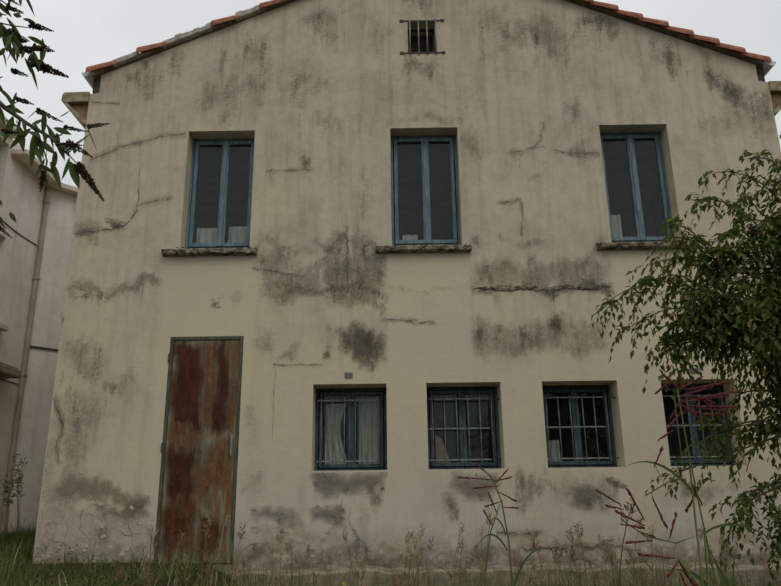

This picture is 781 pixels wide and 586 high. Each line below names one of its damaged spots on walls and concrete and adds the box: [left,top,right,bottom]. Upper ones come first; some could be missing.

crack [73,134,182,234]
corrosion [170,343,203,436]
corrosion [211,341,230,433]
damp [343,325,383,364]
corrosion [160,446,221,554]